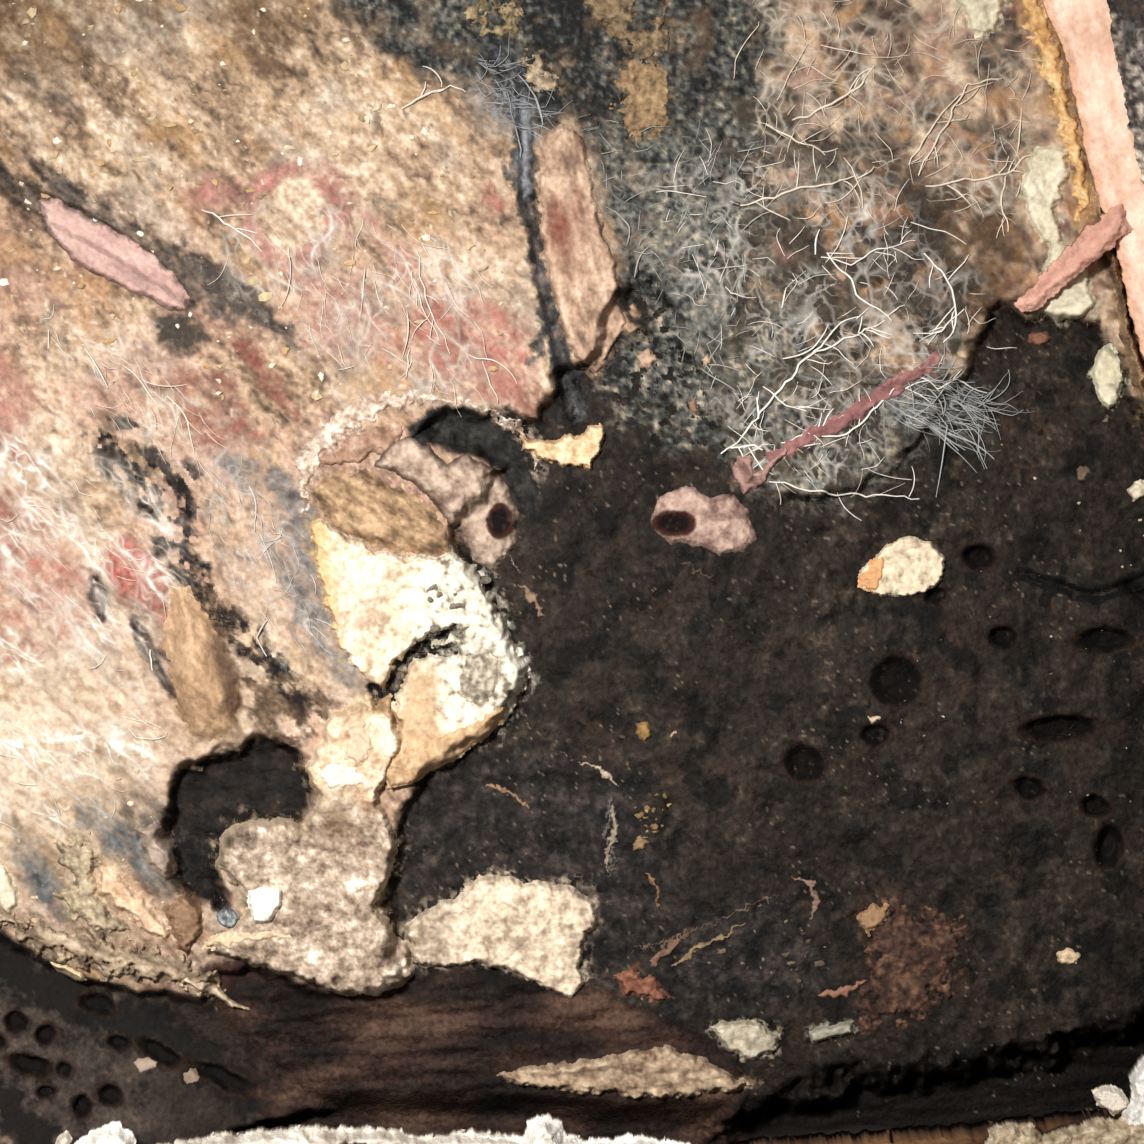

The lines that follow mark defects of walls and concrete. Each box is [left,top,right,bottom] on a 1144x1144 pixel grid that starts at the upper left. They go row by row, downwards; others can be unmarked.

leakage [242,165,321,267]
leakage [315,169,366,233]
leakage [333,0,1021,510]
spalling [155,124,1144,1144]
peeling [0,864,221,991]
spalling [49,738,311,957]
spalling [0,930,273,1144]